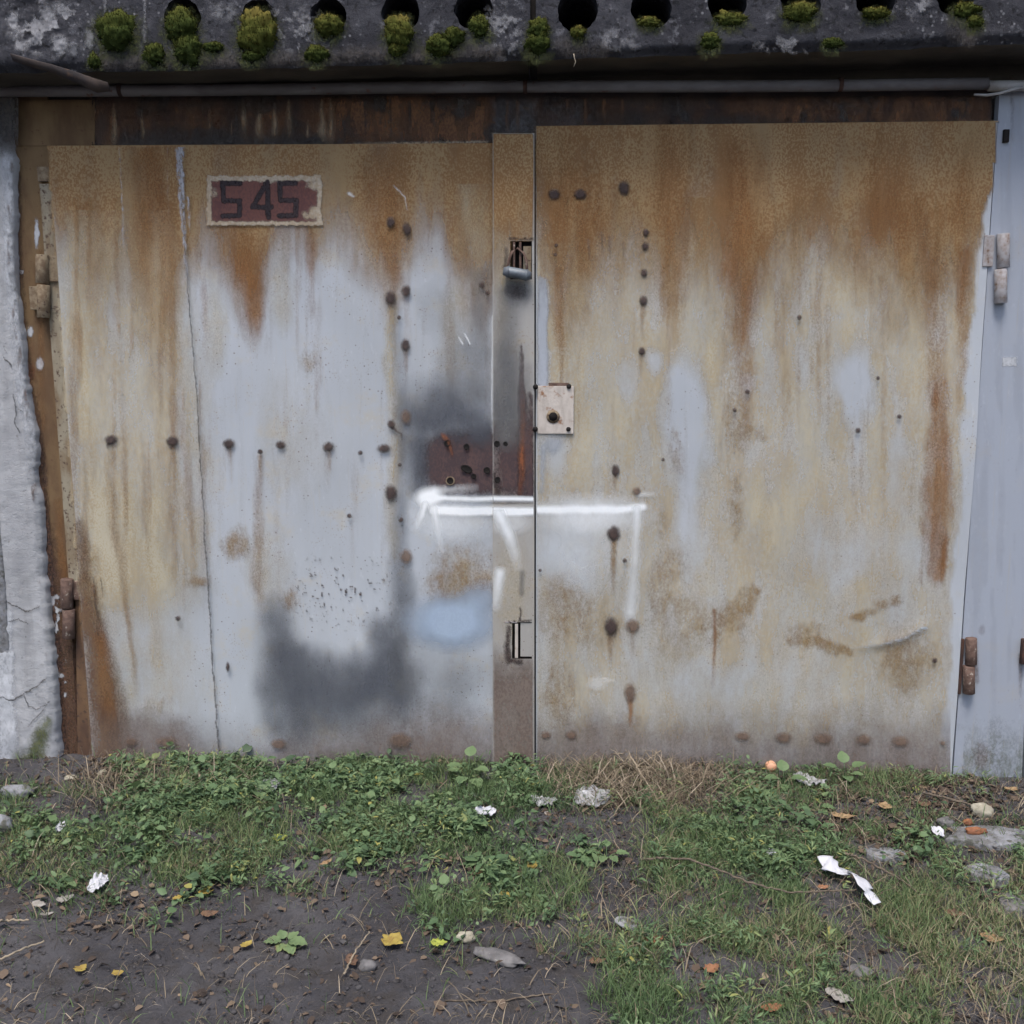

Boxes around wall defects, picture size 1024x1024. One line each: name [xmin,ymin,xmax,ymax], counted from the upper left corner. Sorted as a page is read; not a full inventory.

crack [0,679,49,721]
rust [42,96,998,778]